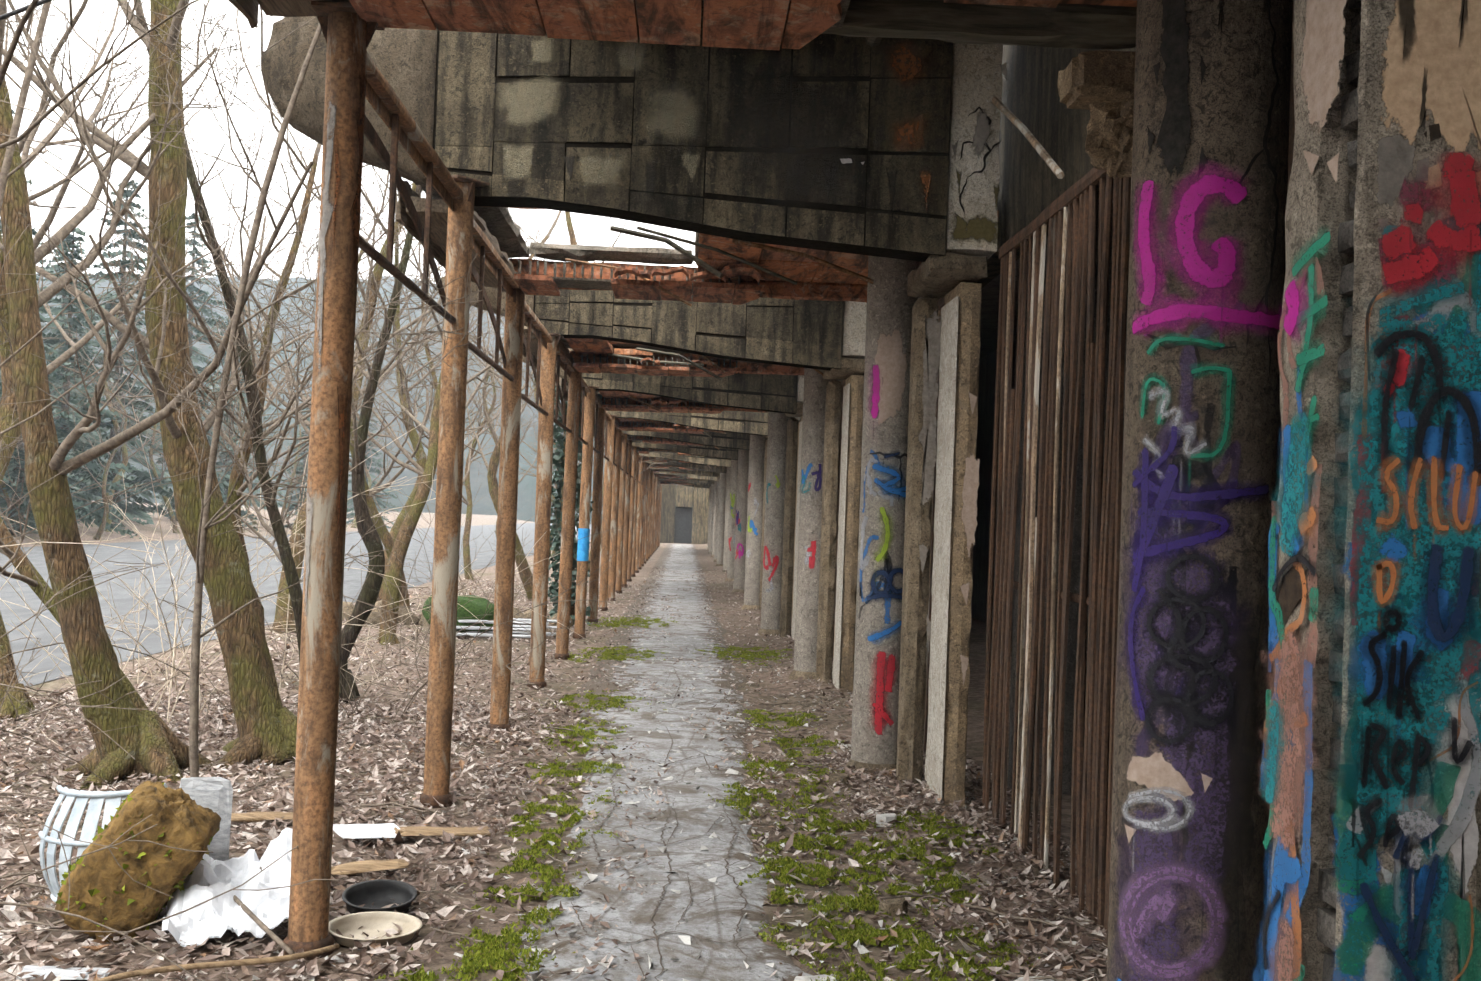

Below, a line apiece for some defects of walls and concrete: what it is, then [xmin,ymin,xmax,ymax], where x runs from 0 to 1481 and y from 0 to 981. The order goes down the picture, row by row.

corrosion [333,76,367,254]
leakage [504,147,532,177]
leakage [503,40,558,123]
leakage [563,156,622,185]
leakage [648,92,697,138]
leakage [682,155,700,183]
leakage [729,59,860,206]
crack [959,106,1002,215]
spalling [1085,0,1208,179]
flaking render [1380,0,1481,204]
corrosion [336,398,347,534]